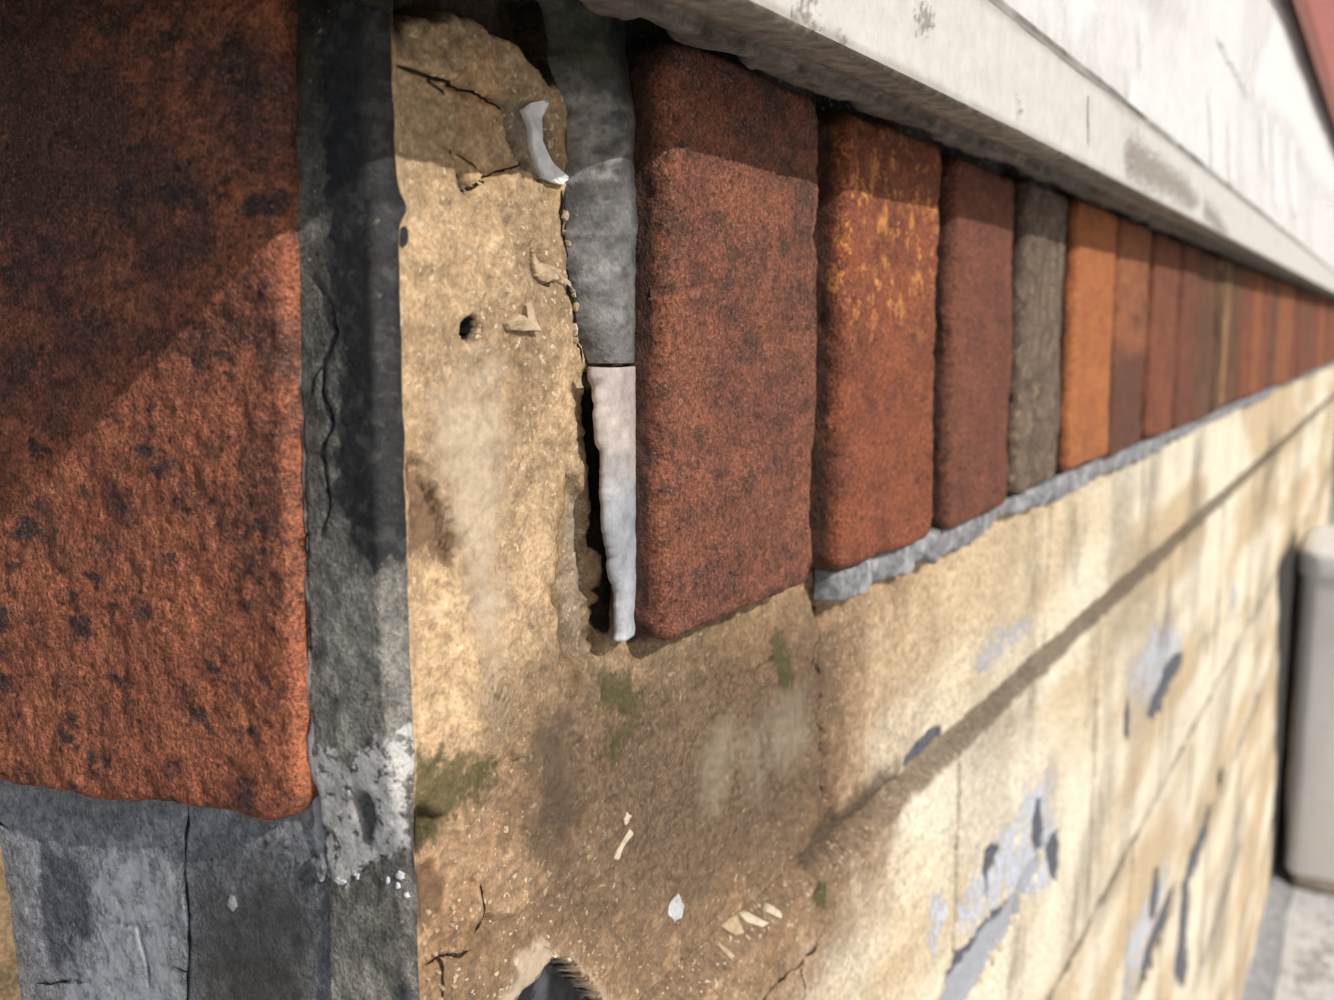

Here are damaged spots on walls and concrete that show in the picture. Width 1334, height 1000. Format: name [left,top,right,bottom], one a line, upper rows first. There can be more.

crack [396,65,501,110]
crack [449,149,549,192]
crack [312,278,339,534]
peeling [392,0,641,642]
peeling [299,368,457,934]
peeling [1123,609,1184,739]
crack [124,812,191,1000]
spalling [424,947,457,1000]
crack [425,885,486,997]
spalling [501,934,604,1000]
peeling [927,761,1061,1000]
peeling [1121,807,1210,1000]